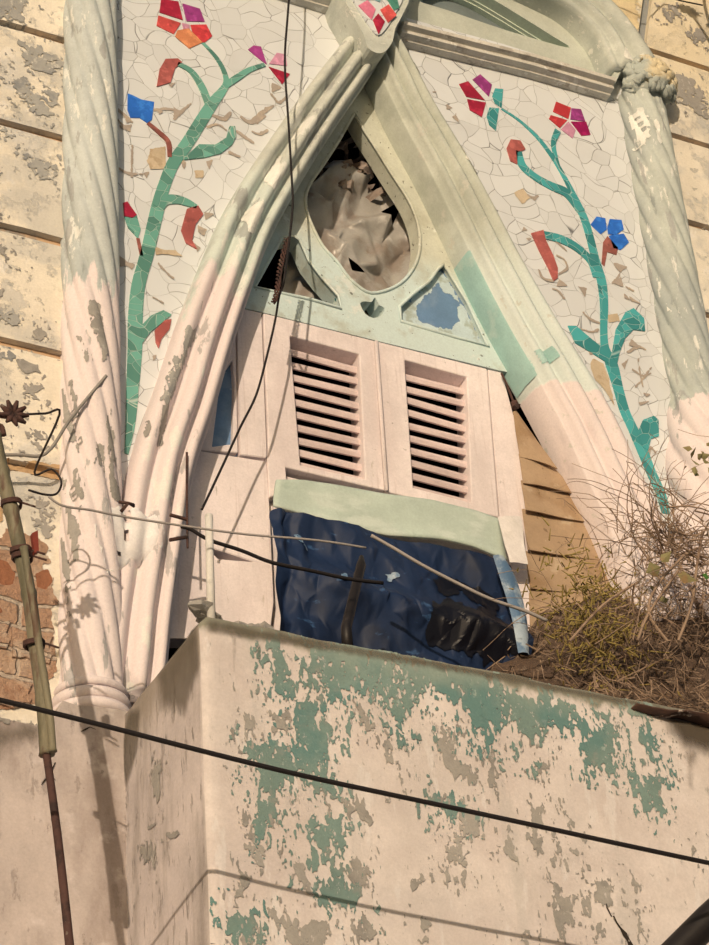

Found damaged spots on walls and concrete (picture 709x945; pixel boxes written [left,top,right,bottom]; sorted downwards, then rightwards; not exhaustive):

peeling [0,0,64,128]
peeling [0,126,65,190]
peeling [628,107,663,151]
peeling [0,231,33,272]
peeling [155,247,183,279]
peeling [0,305,56,346]
peeling [76,300,109,362]
peeling [143,325,196,446]
peeling [94,409,121,501]
spalling [0,347,87,680]
spalling [0,506,38,727]
peeling [209,625,689,945]